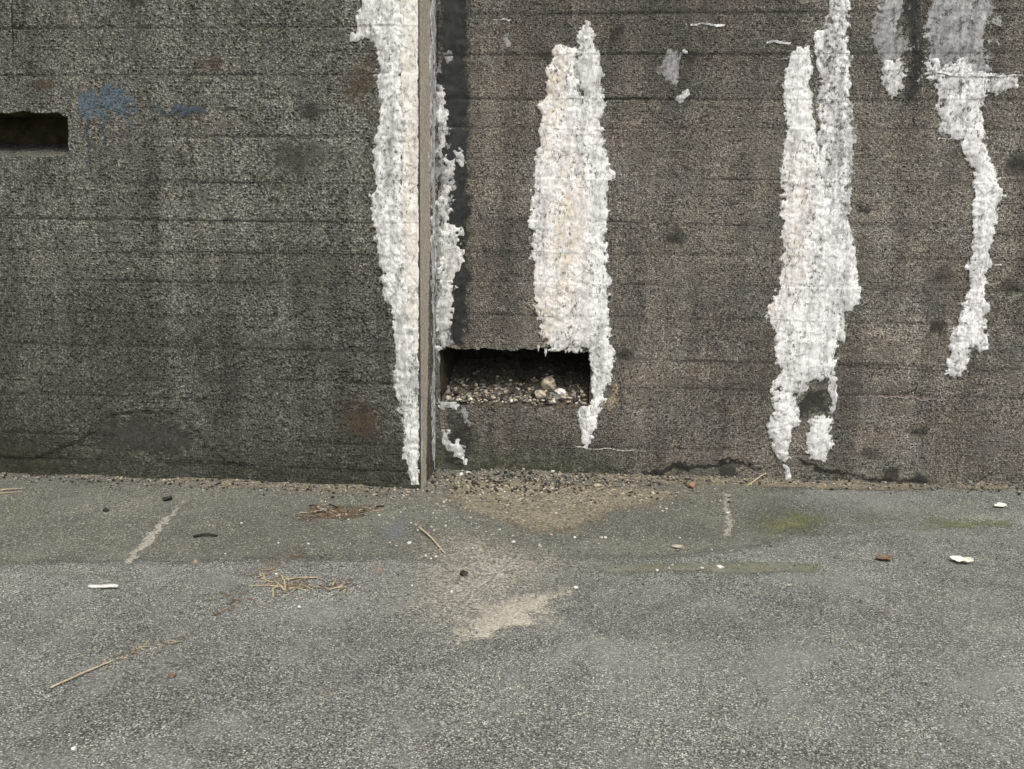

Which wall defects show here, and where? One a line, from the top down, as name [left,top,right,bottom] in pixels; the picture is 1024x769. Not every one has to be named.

leakage [350,0,473,485]
leakage [525,20,634,451]
leakage [765,0,862,479]
leakage [871,0,1022,378]